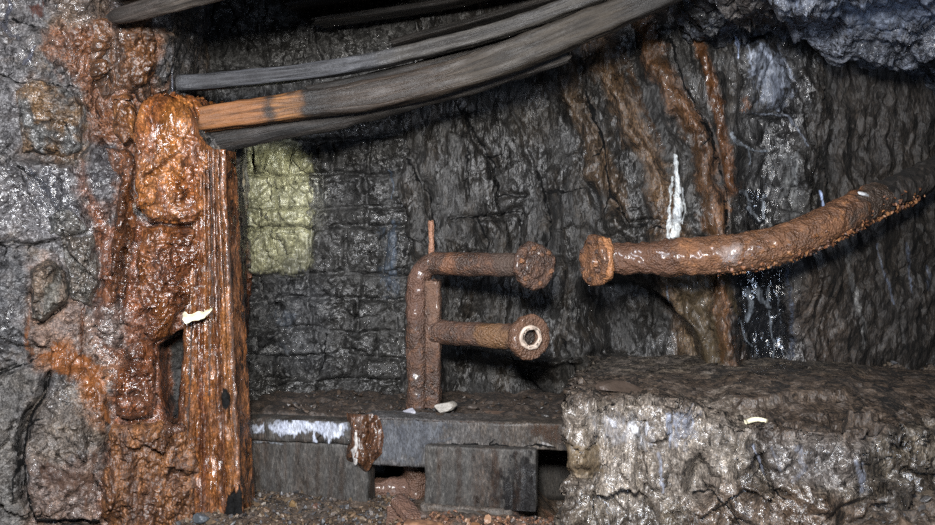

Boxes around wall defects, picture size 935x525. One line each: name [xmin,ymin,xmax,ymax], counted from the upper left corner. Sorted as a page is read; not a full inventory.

rust [635,21,716,236]
rust [695,40,734,188]
damp [666,154,685,239]
rust [32,308,116,425]
damp [252,420,348,445]
rust [346,413,469,471]